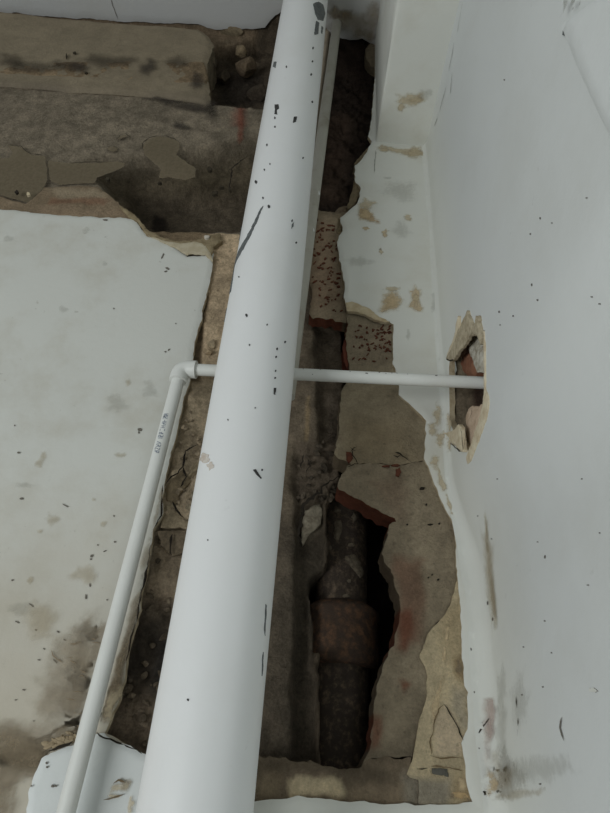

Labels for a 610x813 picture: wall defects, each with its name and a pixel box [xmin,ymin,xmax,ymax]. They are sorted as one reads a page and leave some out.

spalling [246,84,266,101]
peeling [313,2,325,35]
flaking render [364,43,375,78]
peeling [0,144,223,262]
flaking render [308,148,395,373]
spalling [444,310,490,464]
crack [155,485,163,526]
spalling [155,411,202,564]
crack [382,452,412,477]
crack [126,545,151,661]
flaking render [255,383,471,805]
damp [0,733,44,813]